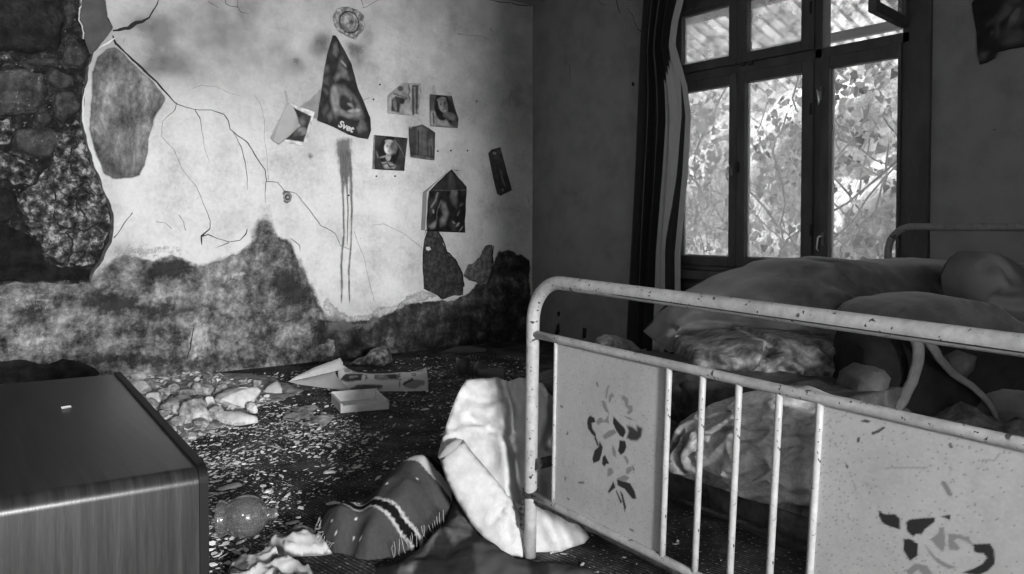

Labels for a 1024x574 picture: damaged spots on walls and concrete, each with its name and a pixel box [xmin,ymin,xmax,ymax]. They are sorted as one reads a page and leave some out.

flaking render [0,0,165,285]
crack [112,0,422,298]
leakage [337,139,353,302]
flaking render [324,230,494,322]